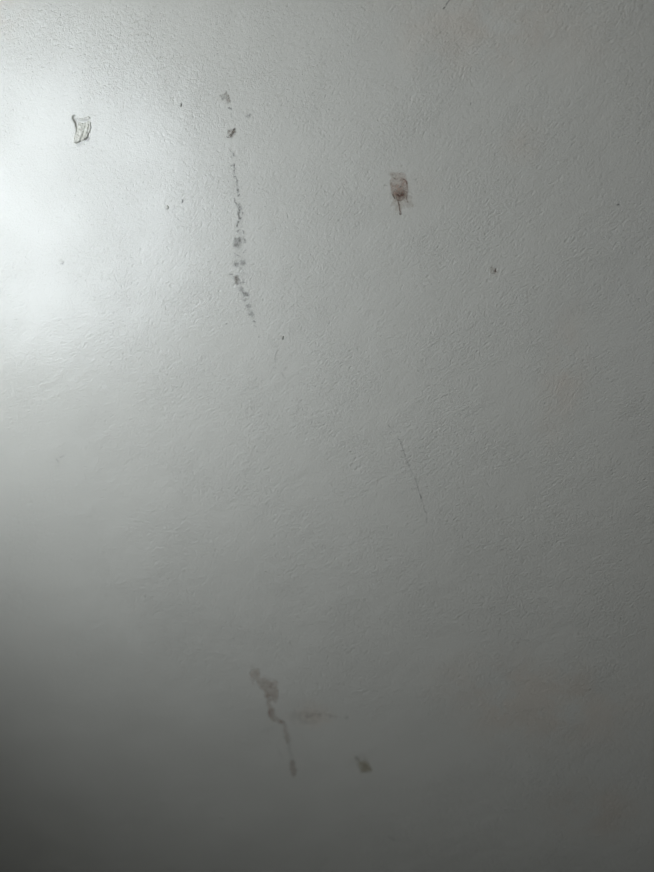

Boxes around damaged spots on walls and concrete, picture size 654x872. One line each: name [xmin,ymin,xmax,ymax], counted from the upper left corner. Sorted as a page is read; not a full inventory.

peeling [73,116,91,144]